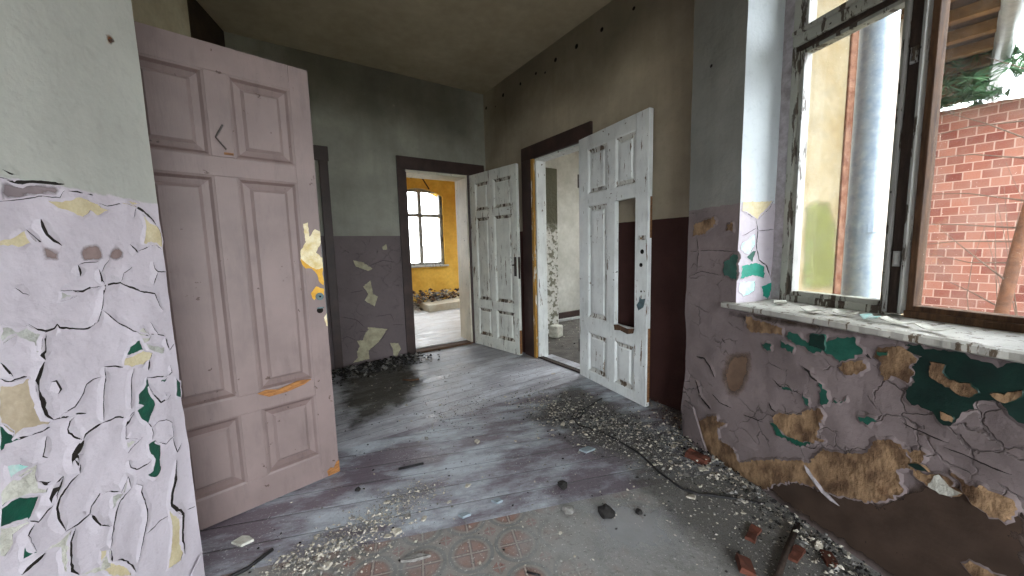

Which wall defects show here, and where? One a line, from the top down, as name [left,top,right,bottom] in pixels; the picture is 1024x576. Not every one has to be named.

peeling [300,223,324,300]
peeling [692,200,787,304]
peeling [800,305,955,331]
crack [0,164,195,576]
peeling [122,339,182,426]
crack [695,354,777,424]
crack [801,364,819,384]
peeling [745,314,1024,430]
peeling [0,376,131,576]
peeling [144,437,162,481]
spalling [684,381,1024,525]
crack [902,420,1012,478]